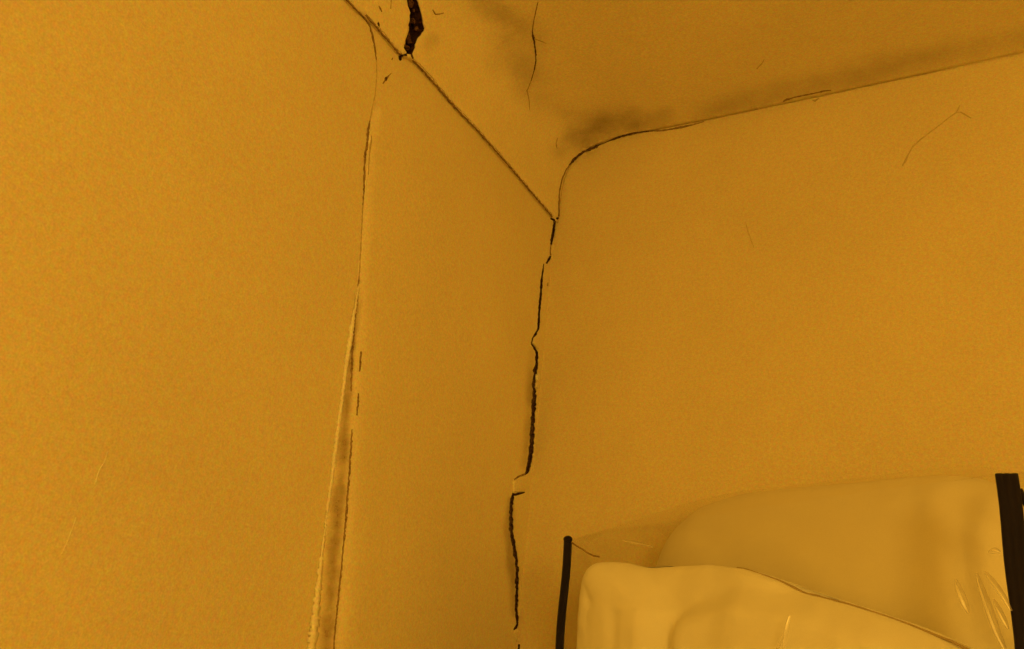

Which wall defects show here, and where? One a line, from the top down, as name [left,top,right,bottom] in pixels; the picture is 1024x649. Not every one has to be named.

crack [346,0,1023,649]